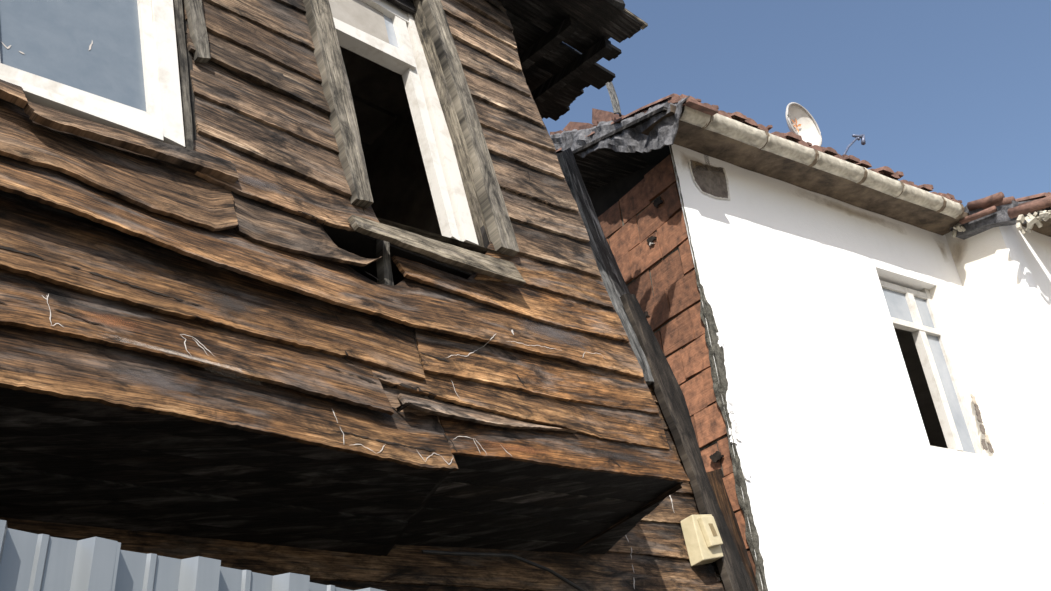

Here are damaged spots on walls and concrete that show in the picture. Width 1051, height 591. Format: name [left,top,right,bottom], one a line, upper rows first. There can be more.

crack [326,324,458,456]
flaking render [670,145,768,591]